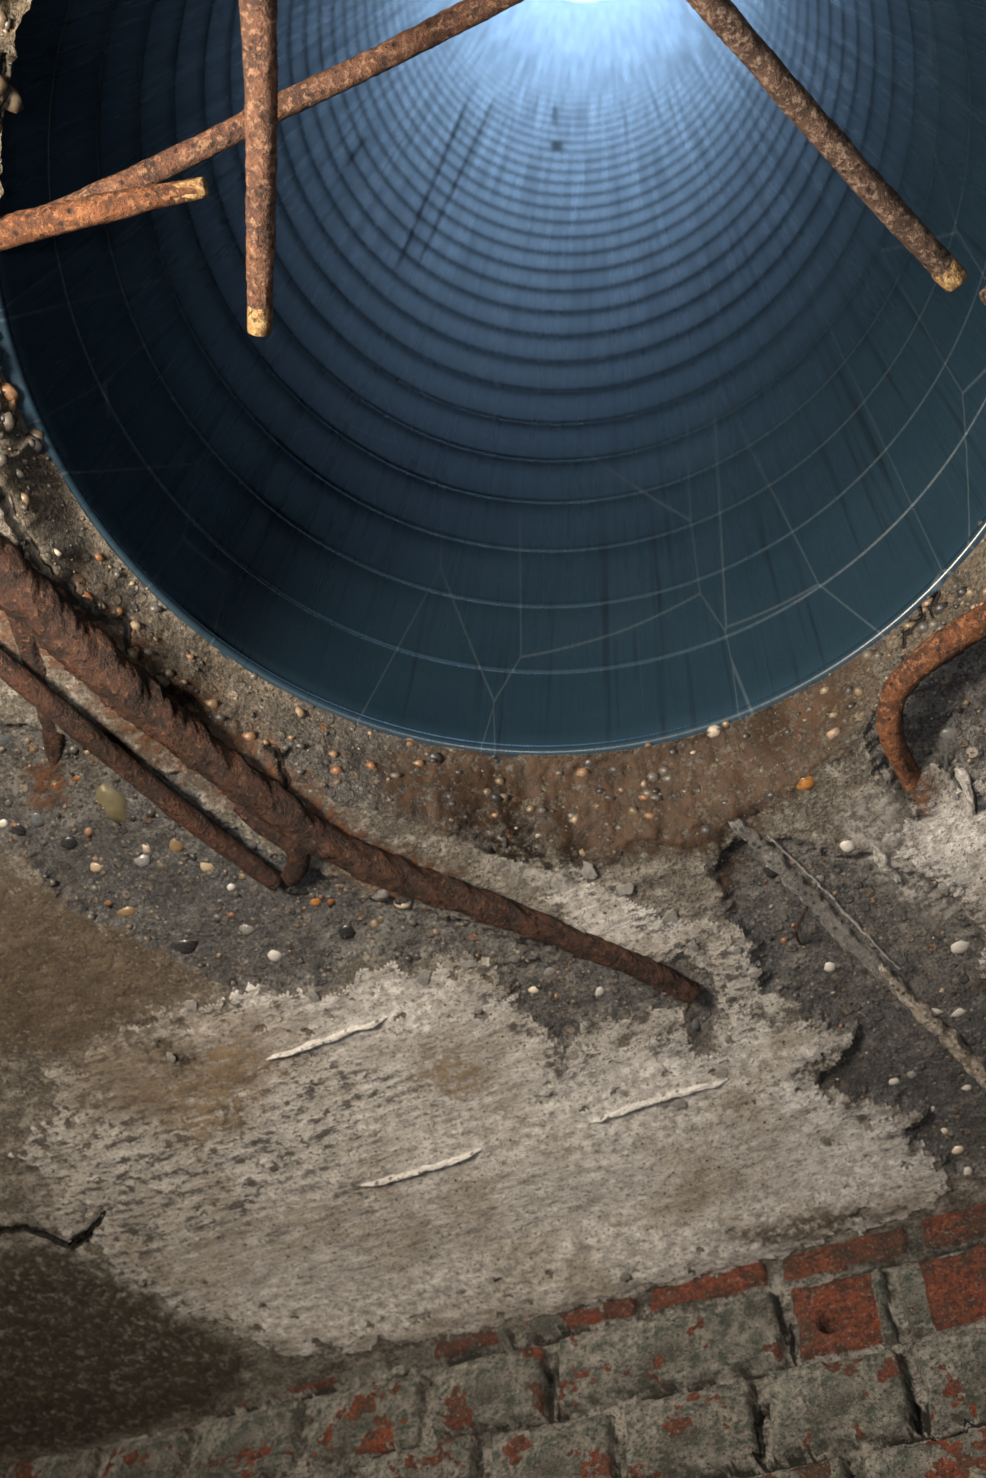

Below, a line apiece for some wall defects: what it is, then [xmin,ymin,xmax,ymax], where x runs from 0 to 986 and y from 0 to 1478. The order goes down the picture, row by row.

spalling [0,0,524,337]
spalling [686,0,967,292]
corrosion [371,654,867,862]
peeling [0,350,986,1478]
crack [0,1210,105,1250]
crack [930,1418,986,1441]